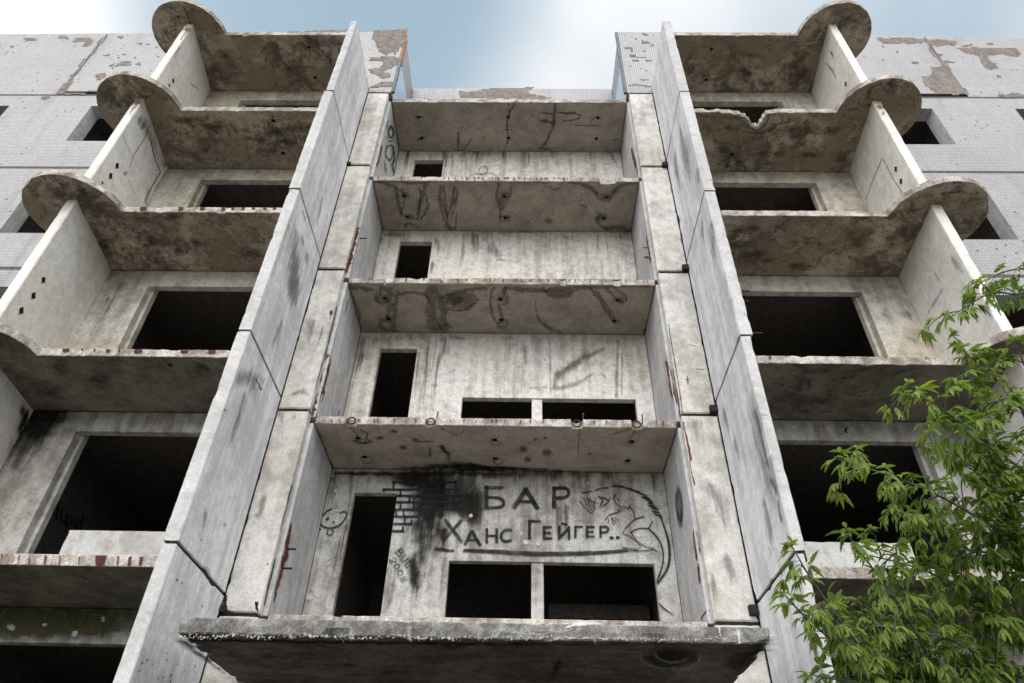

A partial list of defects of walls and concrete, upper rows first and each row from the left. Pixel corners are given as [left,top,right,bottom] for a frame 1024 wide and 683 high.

peeling [40,36,141,100]
peeling [368,28,408,87]
peeling [458,87,551,99]
peeling [876,37,1021,95]
crack [122,133,163,205]
rust [665,362,695,485]
leakage [330,437,561,590]
rust [264,522,292,605]